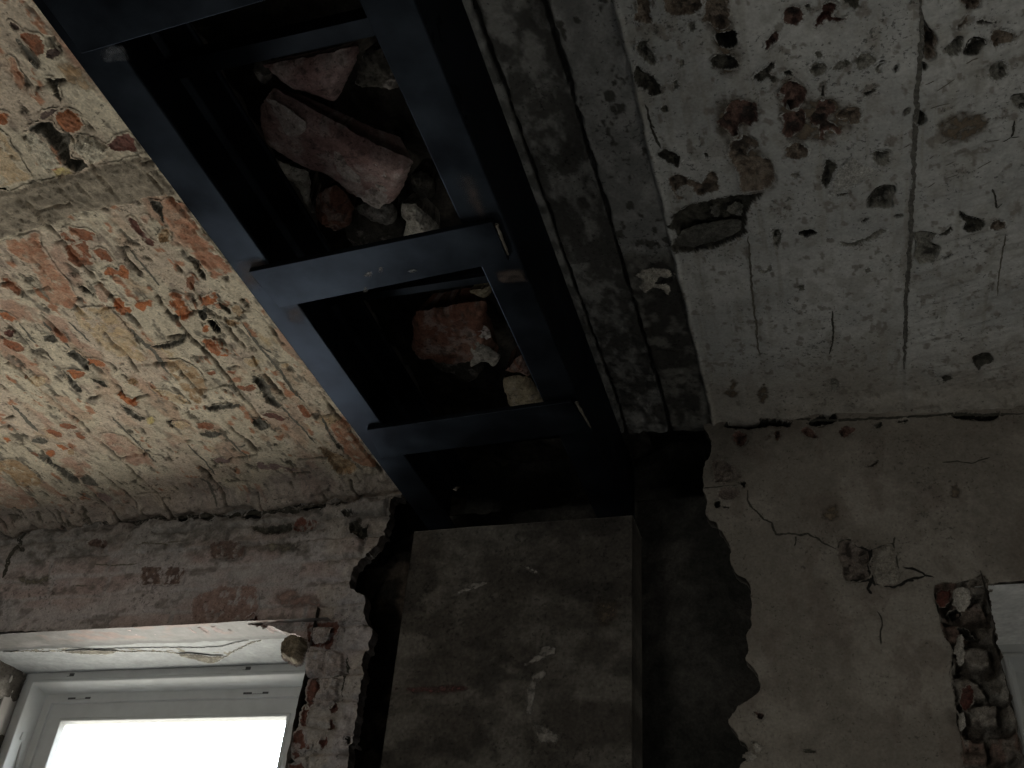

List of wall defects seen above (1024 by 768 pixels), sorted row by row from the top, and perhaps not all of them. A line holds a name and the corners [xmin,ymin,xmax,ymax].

flaking render [0,110,34,188]
flaking render [37,107,85,135]
flaking render [105,132,141,154]
crack [902,0,1018,369]
flaking render [0,276,24,297]
flaking render [58,196,234,321]
flaking render [116,390,139,407]
flaking render [163,358,217,405]
flaking render [0,422,88,488]
crack [705,485,933,644]
flaking render [288,620,347,768]
spalling [933,575,1024,768]